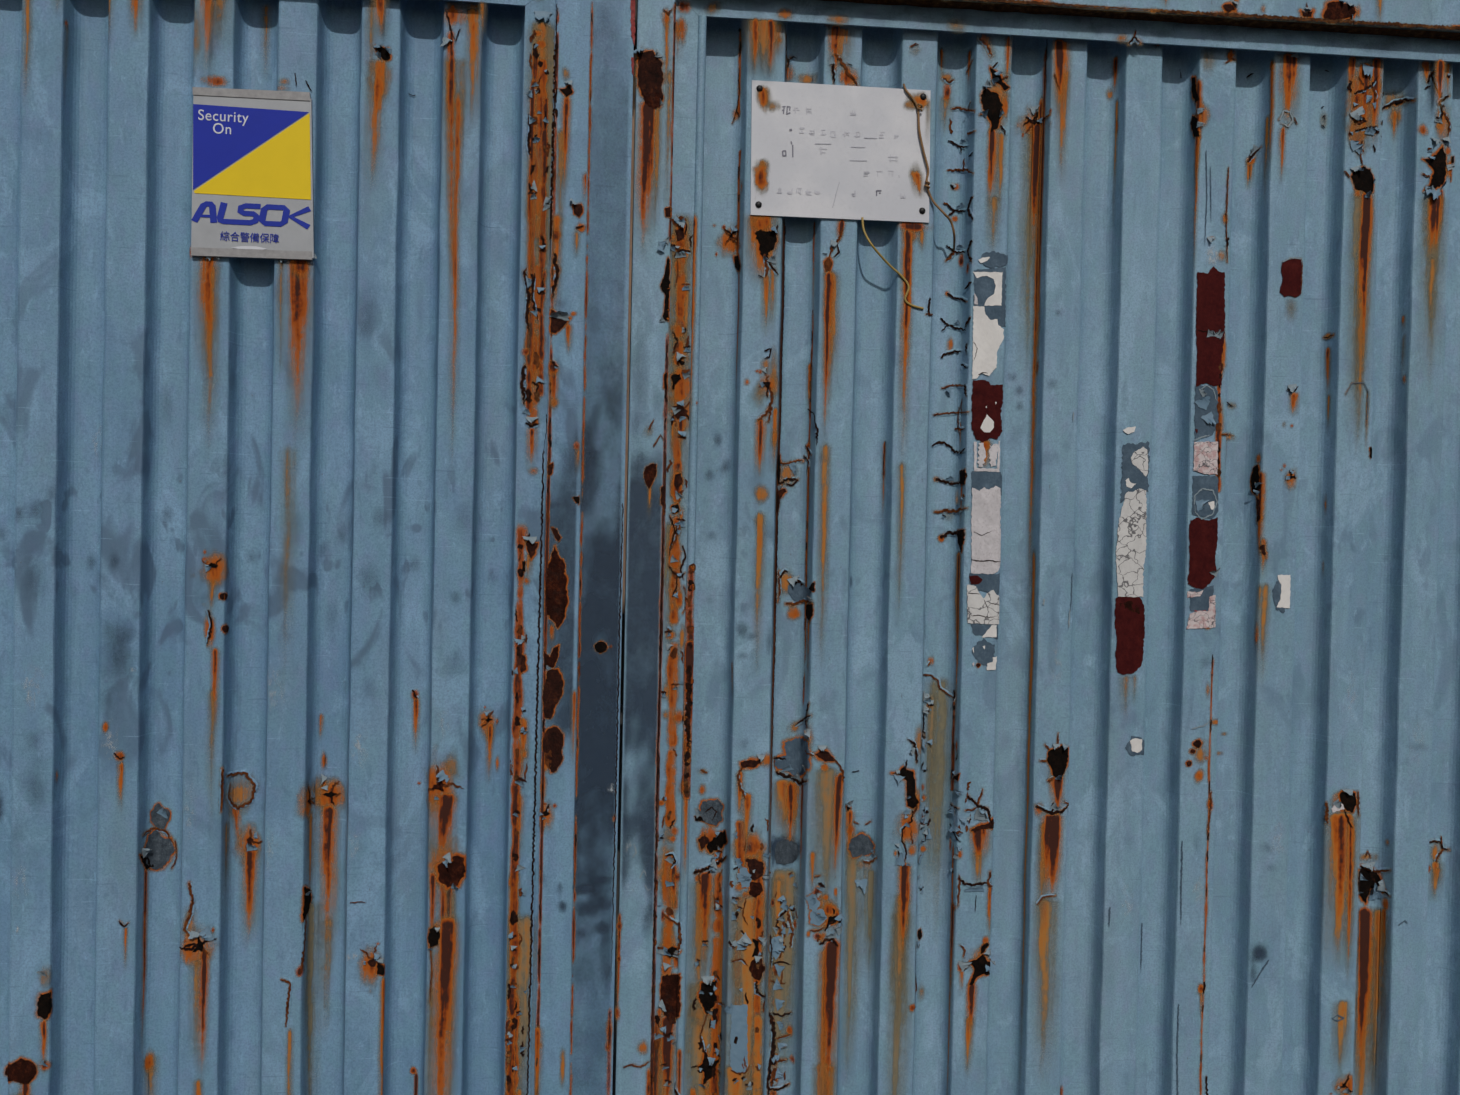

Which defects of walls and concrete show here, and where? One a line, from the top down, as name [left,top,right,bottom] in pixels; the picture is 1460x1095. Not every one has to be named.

corrosion [505,4,561,1095]
corrosion [636,2,689,242]
corrosion [573,150,874,1095]
corrosion [901,222,924,412]
corrosion [1021,39,1069,1015]
corrosion [821,0,1460,175]
peeling [1192,475,1219,520]
peeling [1194,385,1219,441]
corrosion [1323,165,1375,419]
corrosion [1421,59,1455,339]
corrosion [427,852,467,949]
corrosion [890,552,990,1095]